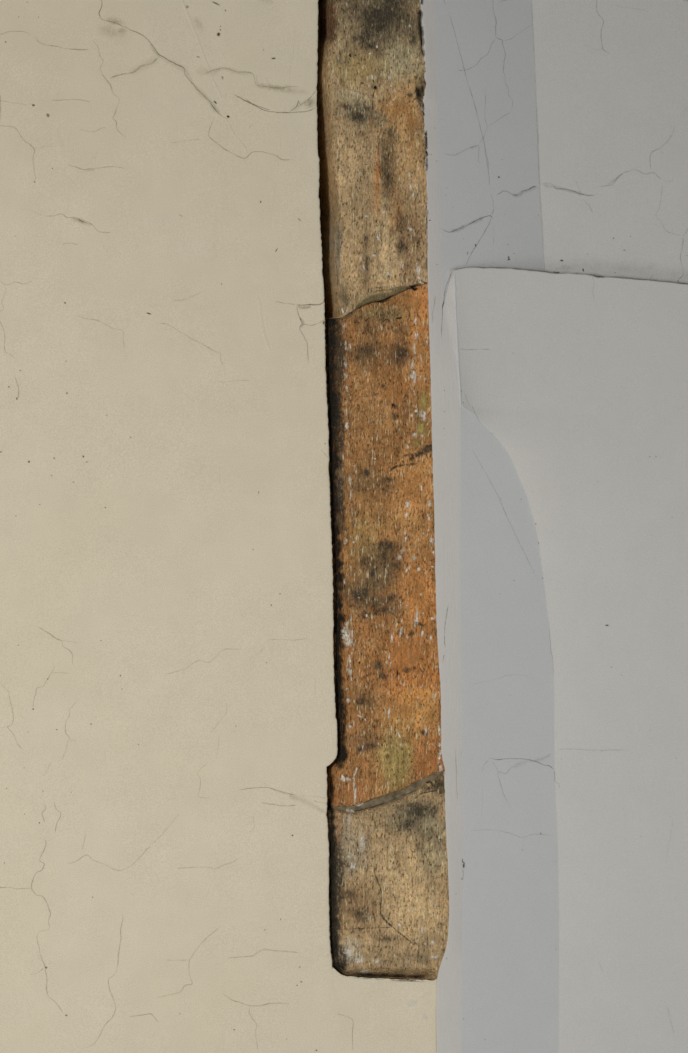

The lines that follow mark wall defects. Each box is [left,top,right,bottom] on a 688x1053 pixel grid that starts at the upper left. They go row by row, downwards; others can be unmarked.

peeling [342,617,360,702]